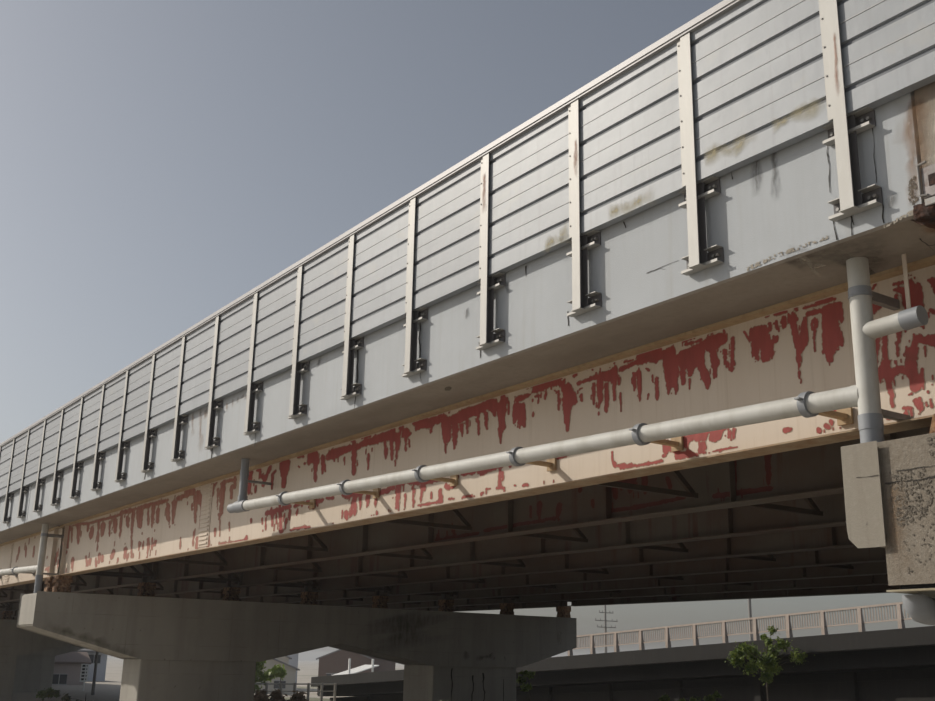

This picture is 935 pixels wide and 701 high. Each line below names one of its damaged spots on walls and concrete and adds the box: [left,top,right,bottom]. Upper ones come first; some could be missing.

peeling [875,274,935,417]
peeling [45,297,844,576]
spalling [889,467,935,574]